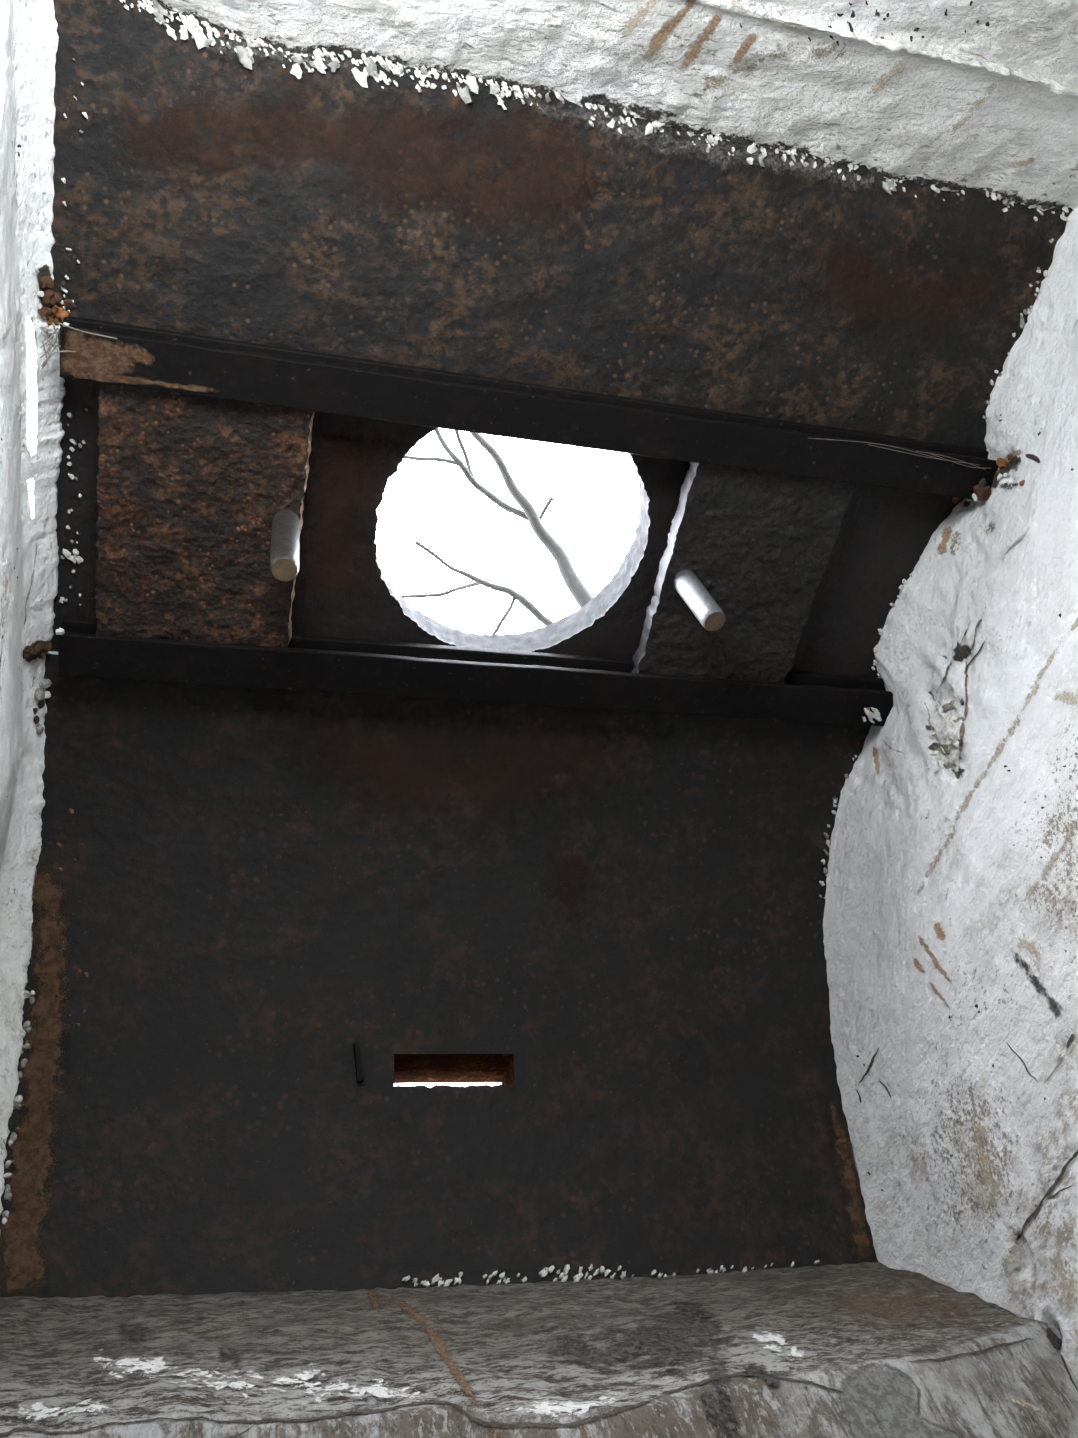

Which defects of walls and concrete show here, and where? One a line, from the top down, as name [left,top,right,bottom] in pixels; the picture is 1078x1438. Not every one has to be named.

rust [644,0,695,59]
rust [681,15,721,69]
rust [734,34,756,63]
spalling [828,1,893,46]
peeling [120,0,861,181]
peeling [882,177,965,201]
peeling [986,191,1069,221]
rust [62,331,216,393]
rust [0,843,88,1294]
crack [1015,1150,1078,1243]
rust [368,1290,477,1404]